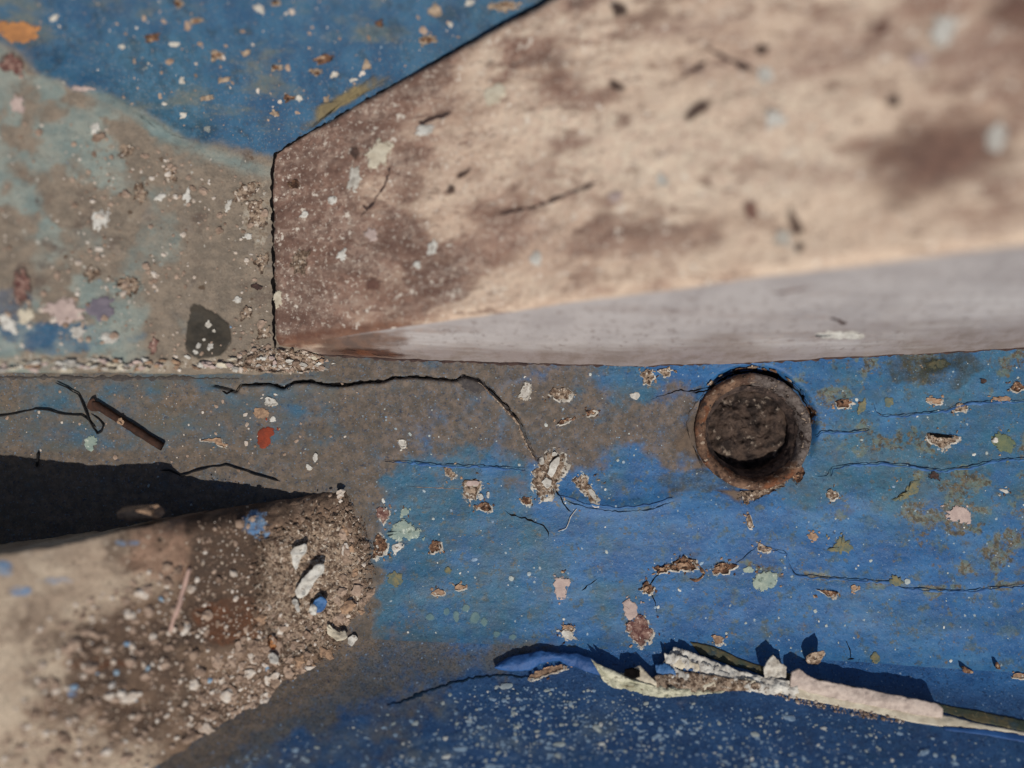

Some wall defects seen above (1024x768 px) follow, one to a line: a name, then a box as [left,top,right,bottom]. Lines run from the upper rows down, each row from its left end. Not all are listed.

peeling [0,296,335,374]
crack [222,374,536,489]
peeling [924,427,961,453]
peeling [519,447,606,508]
crack [818,457,1024,477]
crack [507,512,549,537]
spalling [249,494,403,670]
peeling [638,553,739,596]
crack [737,546,1024,594]
peeling [625,613,660,650]
peeling [527,662,572,682]
peeling [591,647,1024,735]